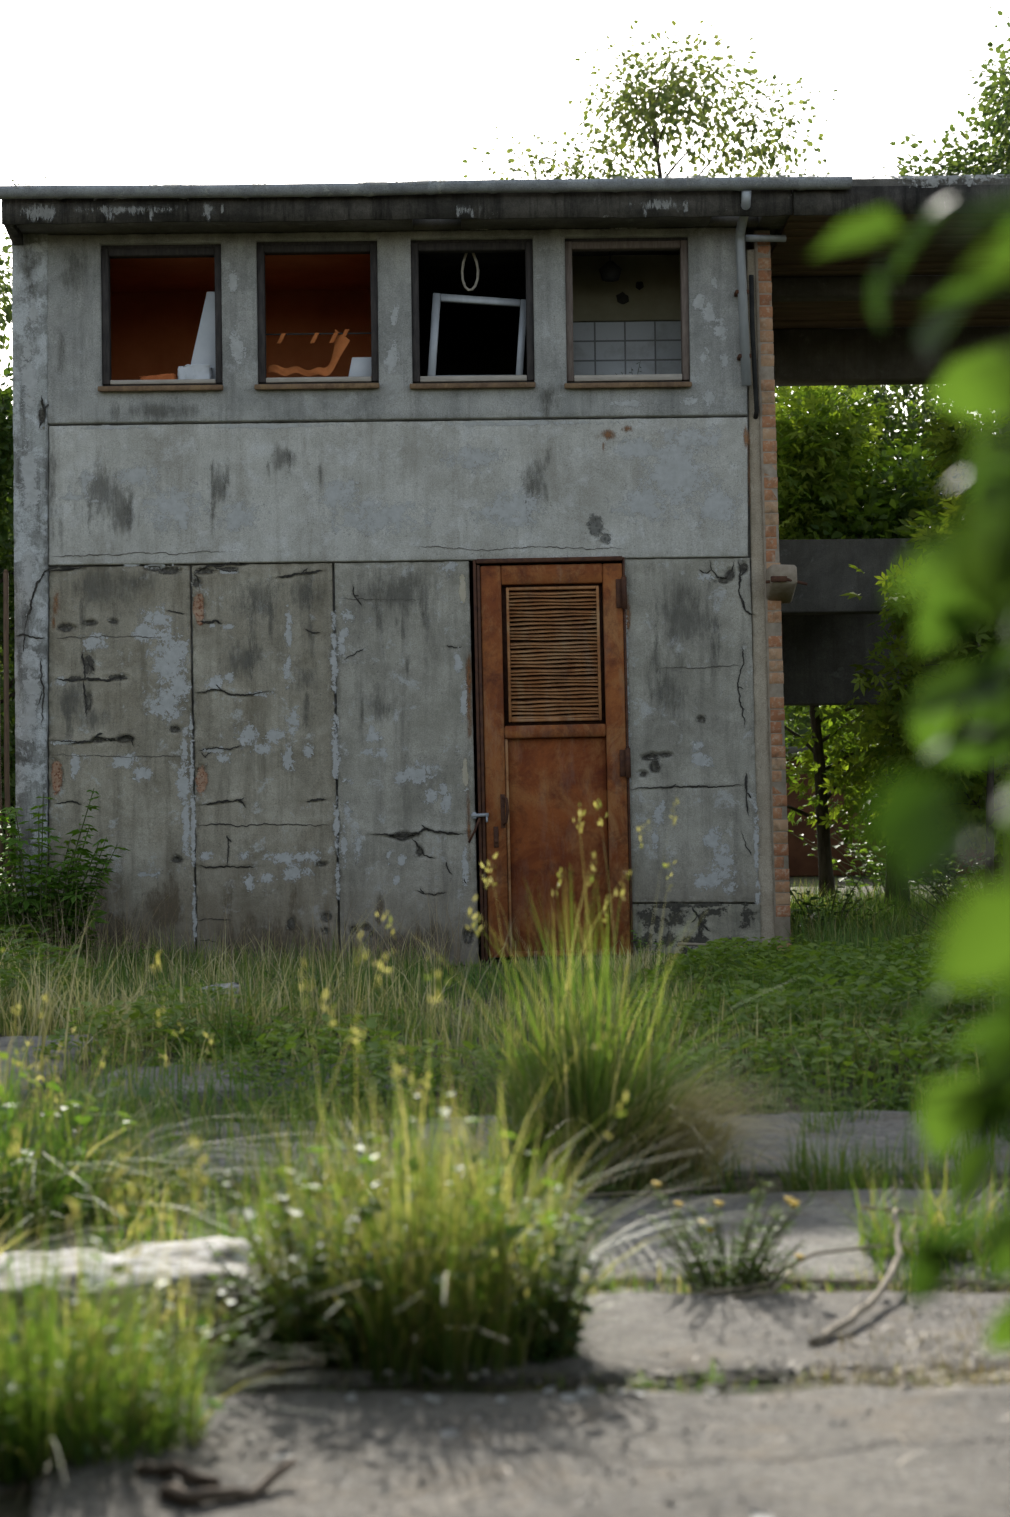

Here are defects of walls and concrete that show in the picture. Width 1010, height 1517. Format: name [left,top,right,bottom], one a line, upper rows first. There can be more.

peeling [17,404,45,615]
peeling [438,560,466,604]
crack [18,551,419,758]
peeling [453,646,468,722]
peeling [19,563,364,942]
peeling [394,758,469,814]
peeling [386,832,423,886]
crack [370,825,469,896]
peeling [693,800,761,905]